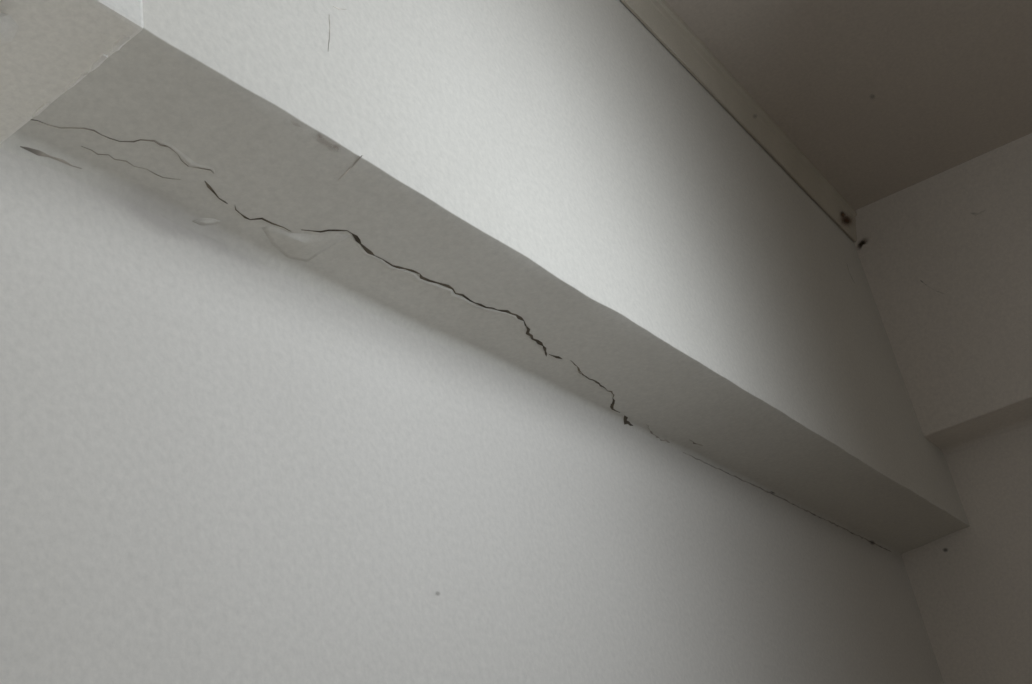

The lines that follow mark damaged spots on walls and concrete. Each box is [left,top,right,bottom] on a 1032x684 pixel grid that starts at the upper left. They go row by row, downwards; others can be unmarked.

crack [20,119,891,552]